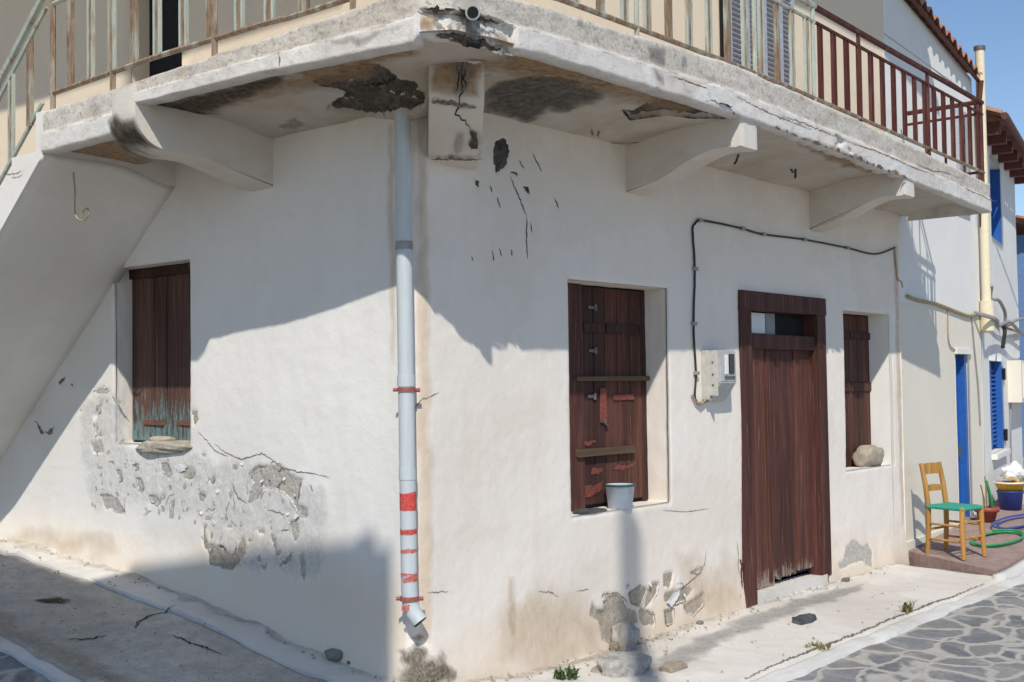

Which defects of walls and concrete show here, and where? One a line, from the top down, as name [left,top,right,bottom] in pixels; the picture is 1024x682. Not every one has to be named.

spalling [420,5,513,64]
spalling [311,63,425,113]
crack [432,62,476,131]
damp [433,60,601,123]
spalling [629,99,733,115]
crack [432,154,482,162]
peeling [493,138,518,175]
flaking render [91,385,308,580]
crack [124,432,329,555]
flaking render [838,539,872,568]
flaking render [589,566,704,643]
damp [402,636,456,682]